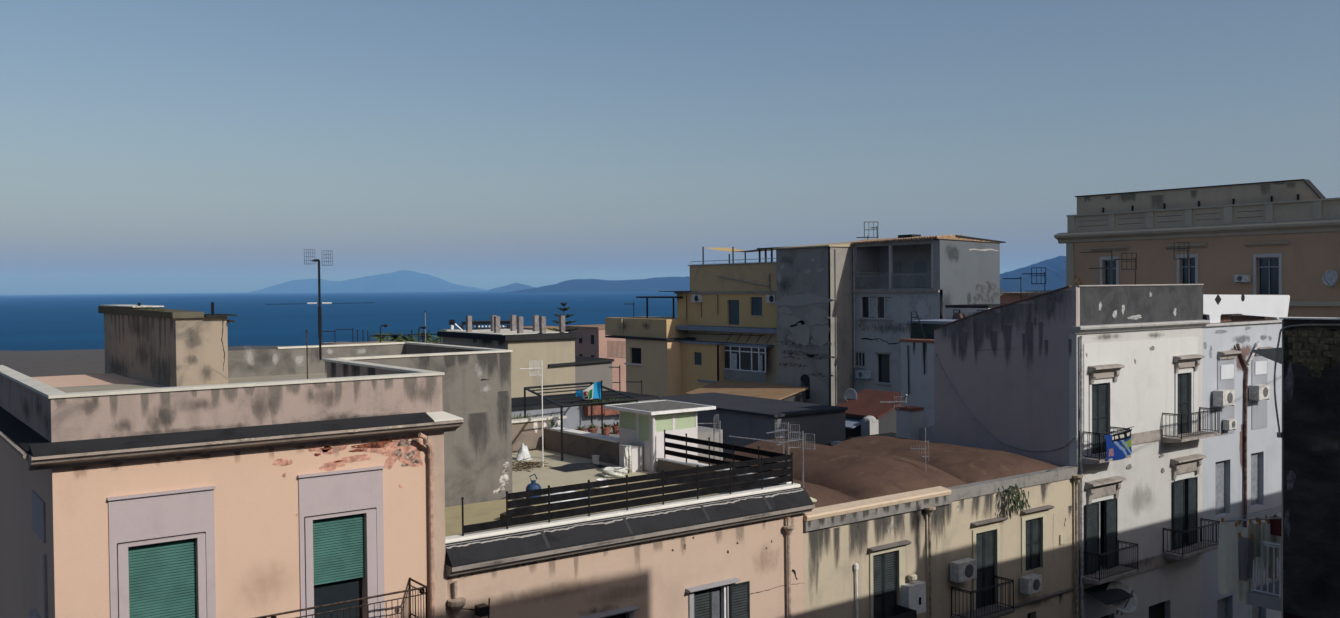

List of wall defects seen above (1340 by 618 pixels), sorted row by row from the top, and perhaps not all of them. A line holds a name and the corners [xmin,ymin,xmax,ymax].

water stain [914,290,1066,358]
water stain [86,395,117,411]
water stain [141,391,201,433]
water stain [204,371,254,401]
water stain [270,384,299,406]
water stain [295,349,435,400]
water stain [445,339,511,446]
peeling [272,458,293,478]
peeling [307,435,423,471]
water stain [791,492,1000,567]